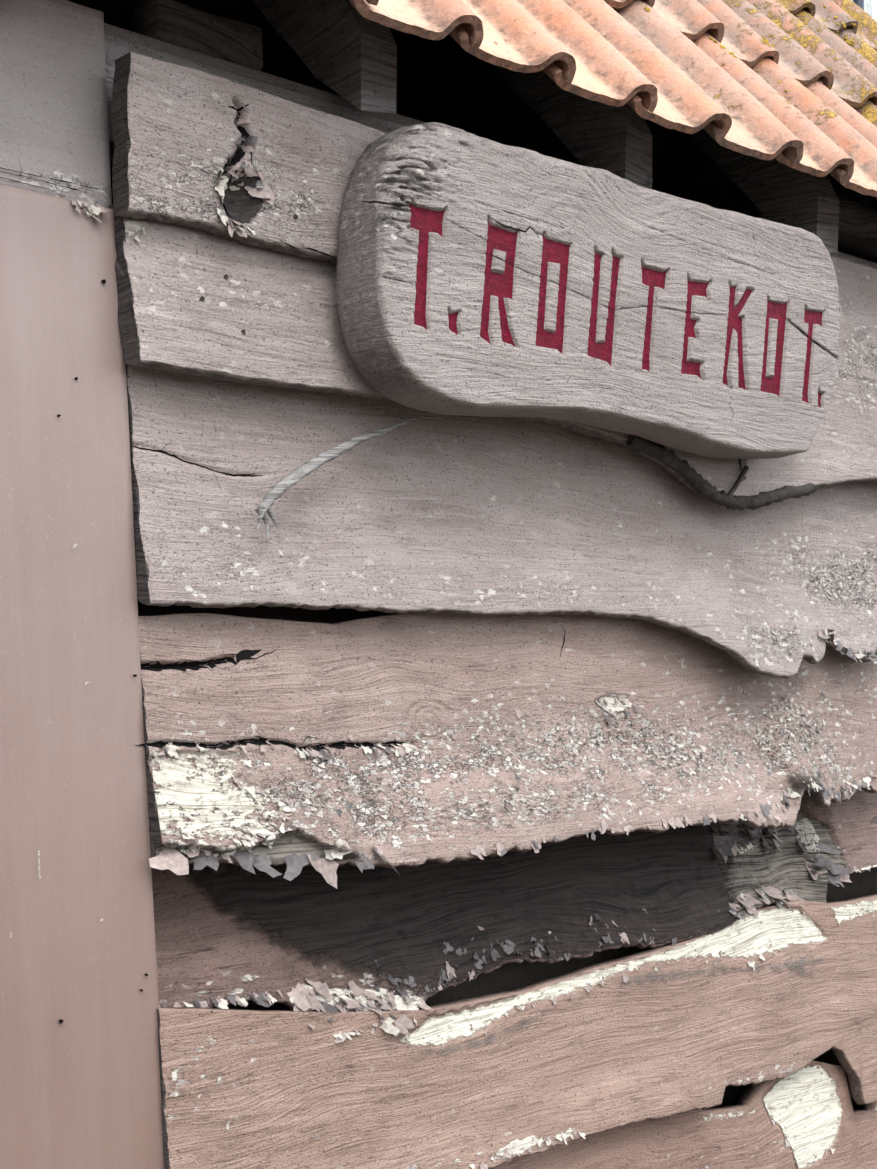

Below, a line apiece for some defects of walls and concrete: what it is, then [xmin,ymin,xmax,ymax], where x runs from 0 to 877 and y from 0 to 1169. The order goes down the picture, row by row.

crack [221,104,258,186]
crack [130,442,263,488]
peeling [149,692,877,1046]
peeling [469,1127,586,1169]
peeling [703,1065,842,1169]